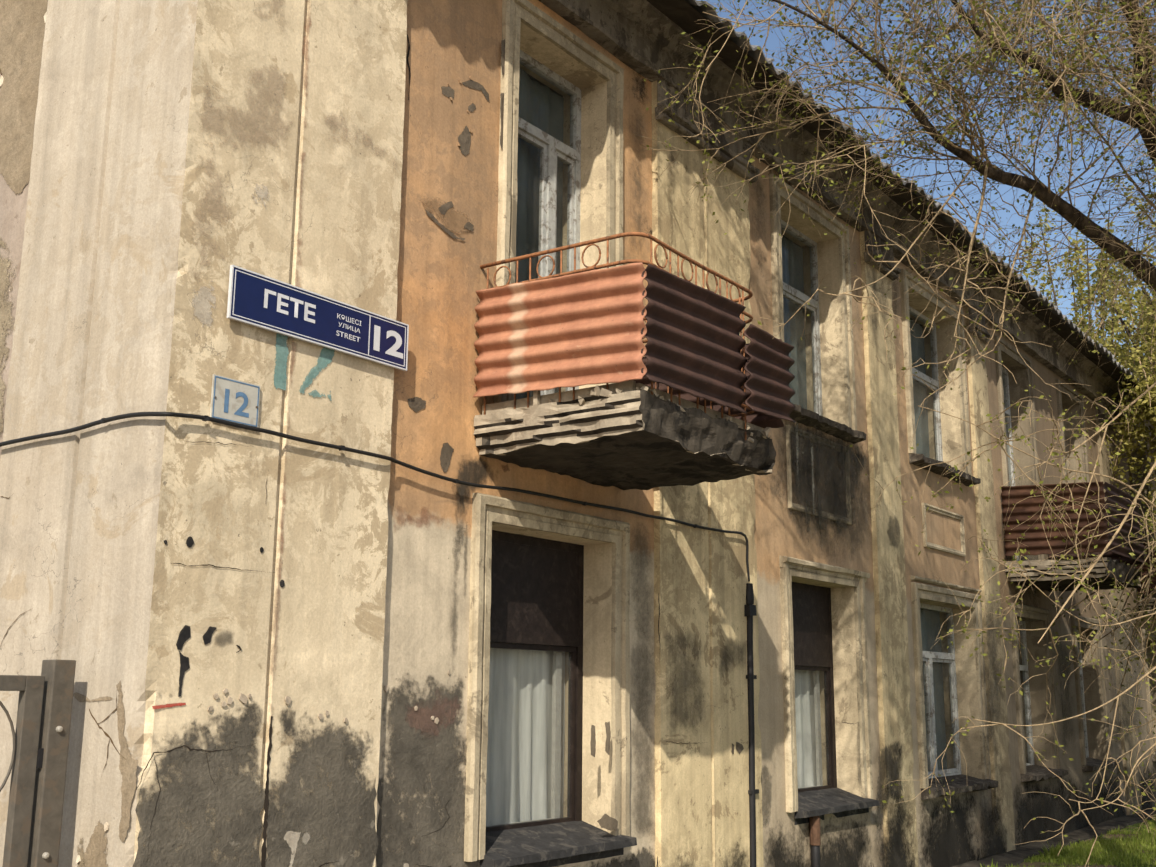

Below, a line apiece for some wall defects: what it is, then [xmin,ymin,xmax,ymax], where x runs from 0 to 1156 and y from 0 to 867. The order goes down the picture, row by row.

spalling [0,0,48,194]
spalling [458,126,473,156]
spalling [441,76,504,151]
spalling [0,238,16,435]
leakage [781,423,870,541]
crack [89,690,273,867]
spalling [73,671,480,867]
leakage [408,698,460,735]
spalling [590,722,611,757]
spalling [597,814,618,831]
spalling [591,847,656,867]
leakage [877,743,902,827]